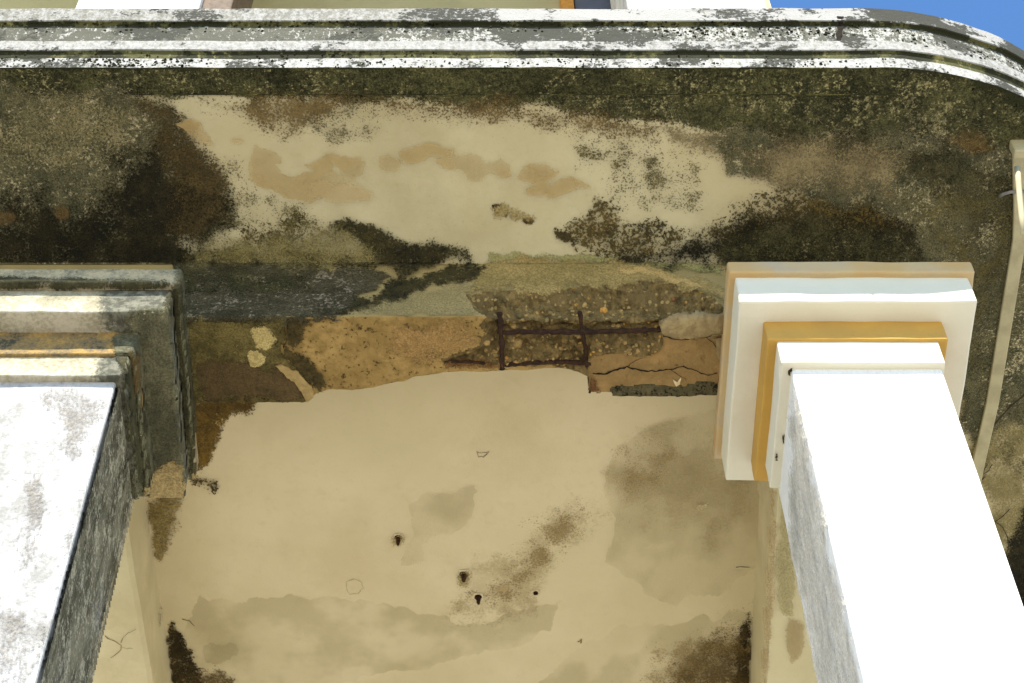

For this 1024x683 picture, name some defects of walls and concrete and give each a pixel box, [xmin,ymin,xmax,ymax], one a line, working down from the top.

peeling [250,153,361,204]
peeling [400,143,453,170]
peeling [524,164,591,198]
peeling [492,201,536,224]
leakage [0,69,1024,607]
spalling [441,281,724,393]
peeling [247,326,314,402]
crack [593,358,717,377]
leakage [652,613,753,683]